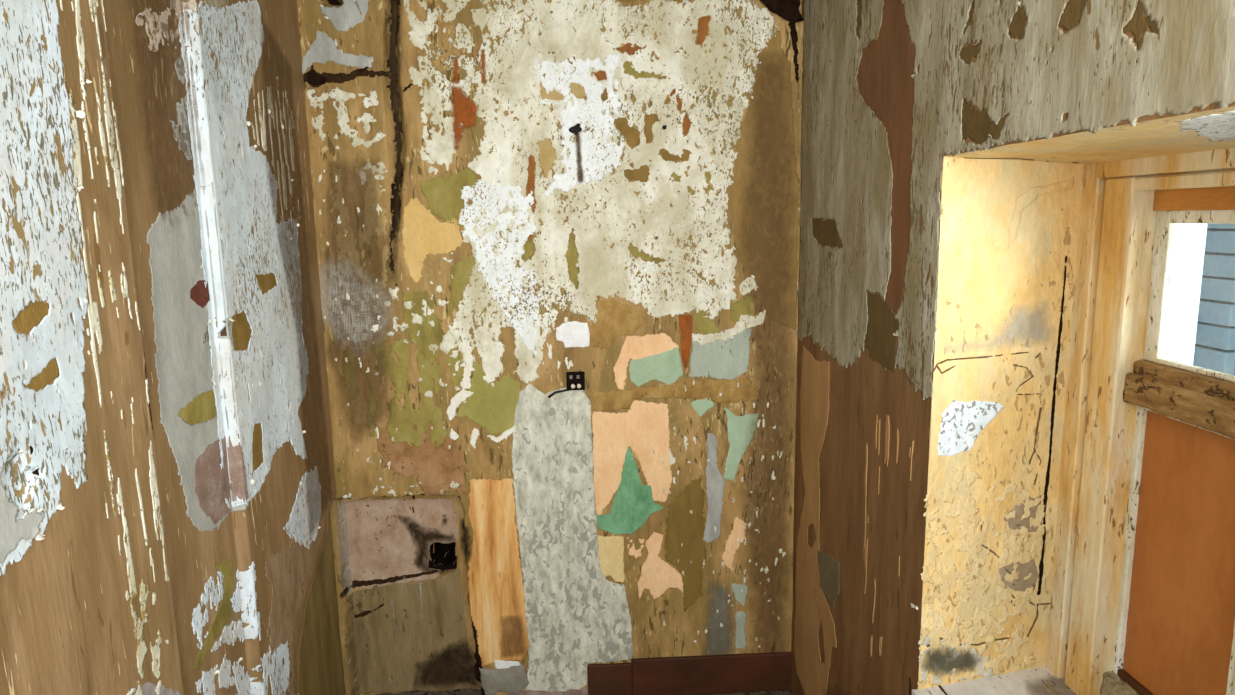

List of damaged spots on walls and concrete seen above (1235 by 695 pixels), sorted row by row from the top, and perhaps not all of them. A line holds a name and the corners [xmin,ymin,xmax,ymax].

peeling [0,0,141,576]
peeling [104,430,181,695]
peeling [135,0,309,532]
flaking render [192,466,477,695]
peeling [302,0,386,149]
water stain [323,274,375,340]
crack [303,0,413,286]
peeling [329,0,1235,695]
water stain [926,650,976,674]
crack [927,256,1067,647]